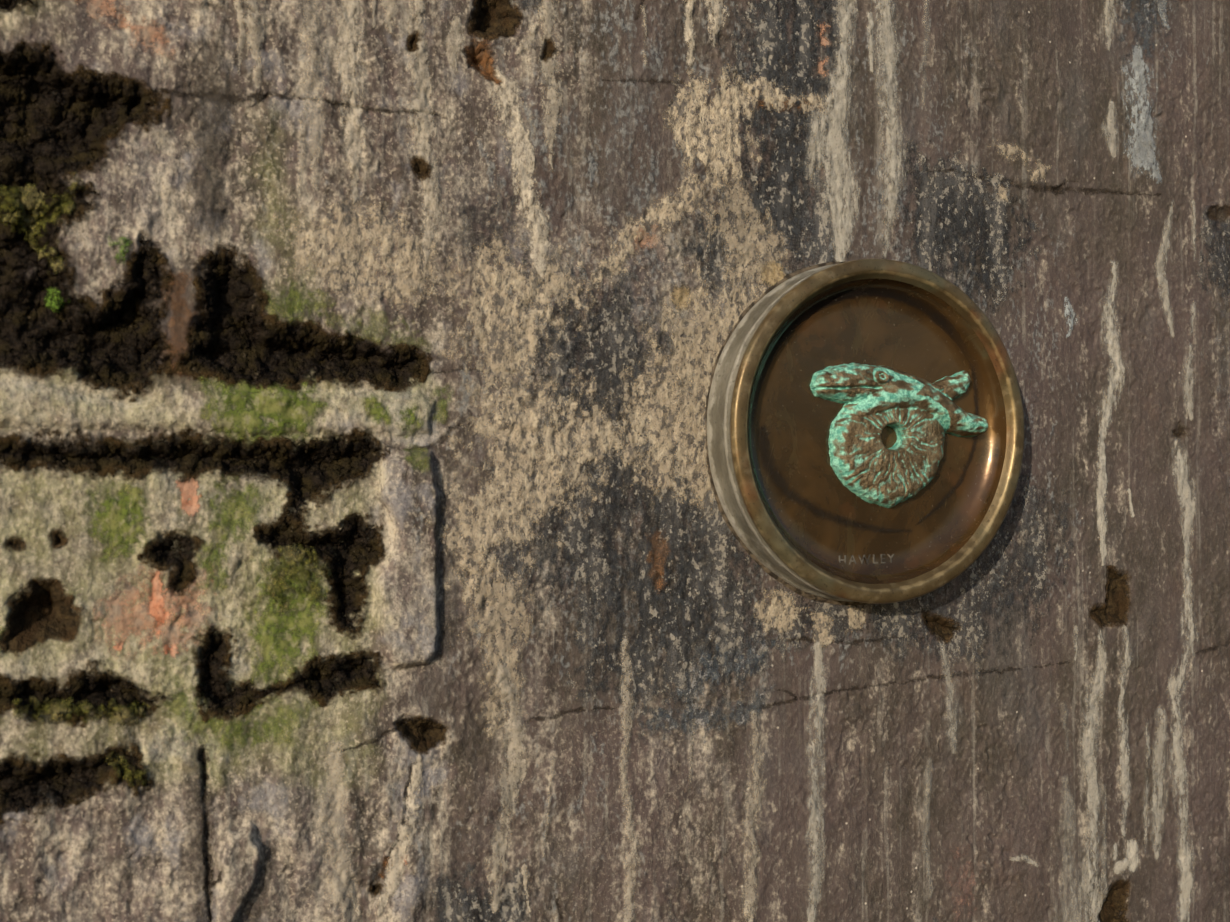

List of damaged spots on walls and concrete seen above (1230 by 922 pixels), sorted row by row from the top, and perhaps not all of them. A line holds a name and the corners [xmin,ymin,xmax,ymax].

crack [157,88,453,120]
crack [906,168,1161,196]
efflorescence [1096,262,1125,566]
water stain [485,0,1078,922]
hole [1090,565,1131,628]
hole [396,716,449,755]
crack [527,706,614,722]
crack [761,661,1069,709]
efflorescence [1074,440,1198,922]
water stain [431,662,531,922]
crack [198,744,222,922]
hole [1099,879,1130,922]